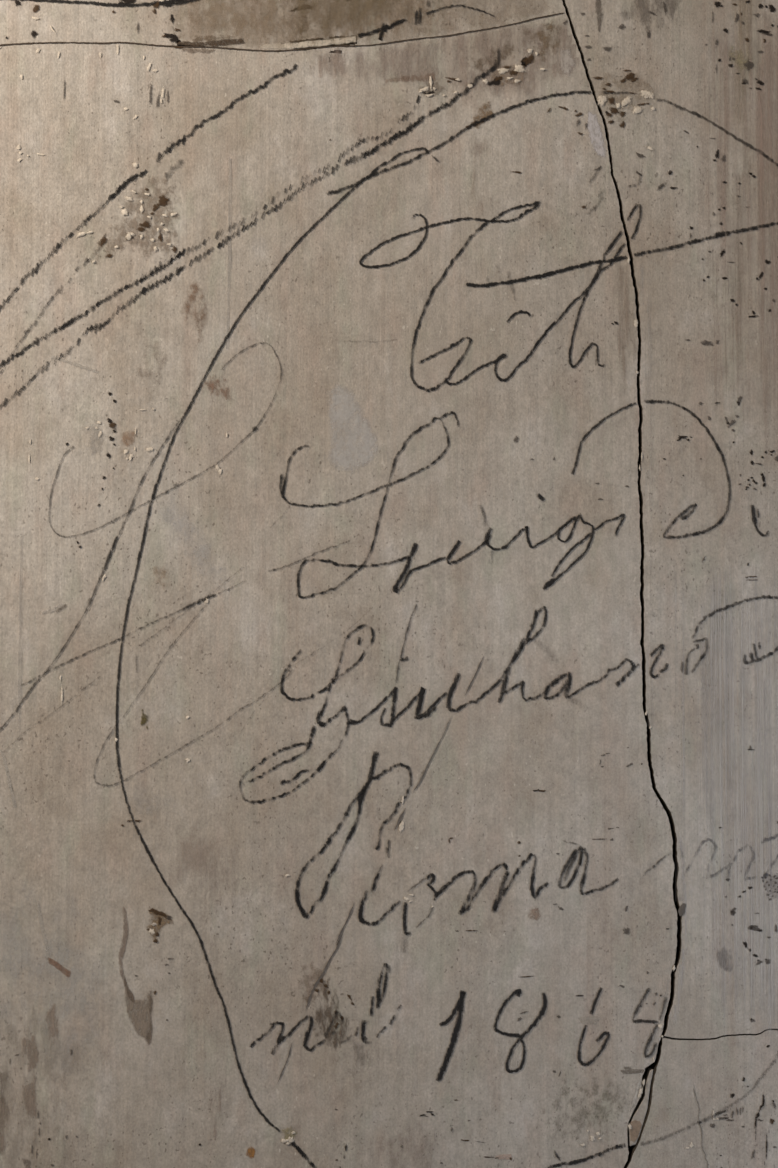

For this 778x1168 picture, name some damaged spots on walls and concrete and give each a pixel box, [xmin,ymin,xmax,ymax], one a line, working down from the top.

crack [562,0,778,1168]